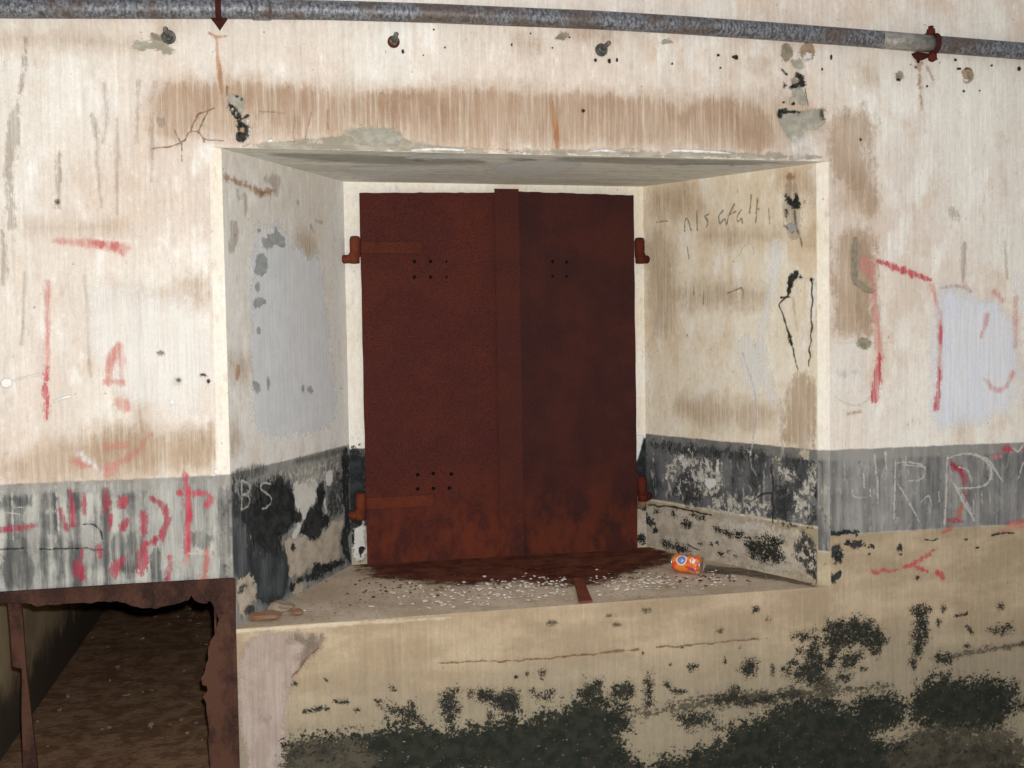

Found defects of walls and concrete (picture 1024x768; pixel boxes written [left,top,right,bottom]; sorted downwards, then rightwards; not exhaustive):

crack [152,86,228,161]
spalling [227,43,833,177]
crack [778,270,813,369]
corrosion [356,547,673,587]
damp [646,504,817,587]
corrosion [8,603,39,768]
damp [275,601,1024,768]